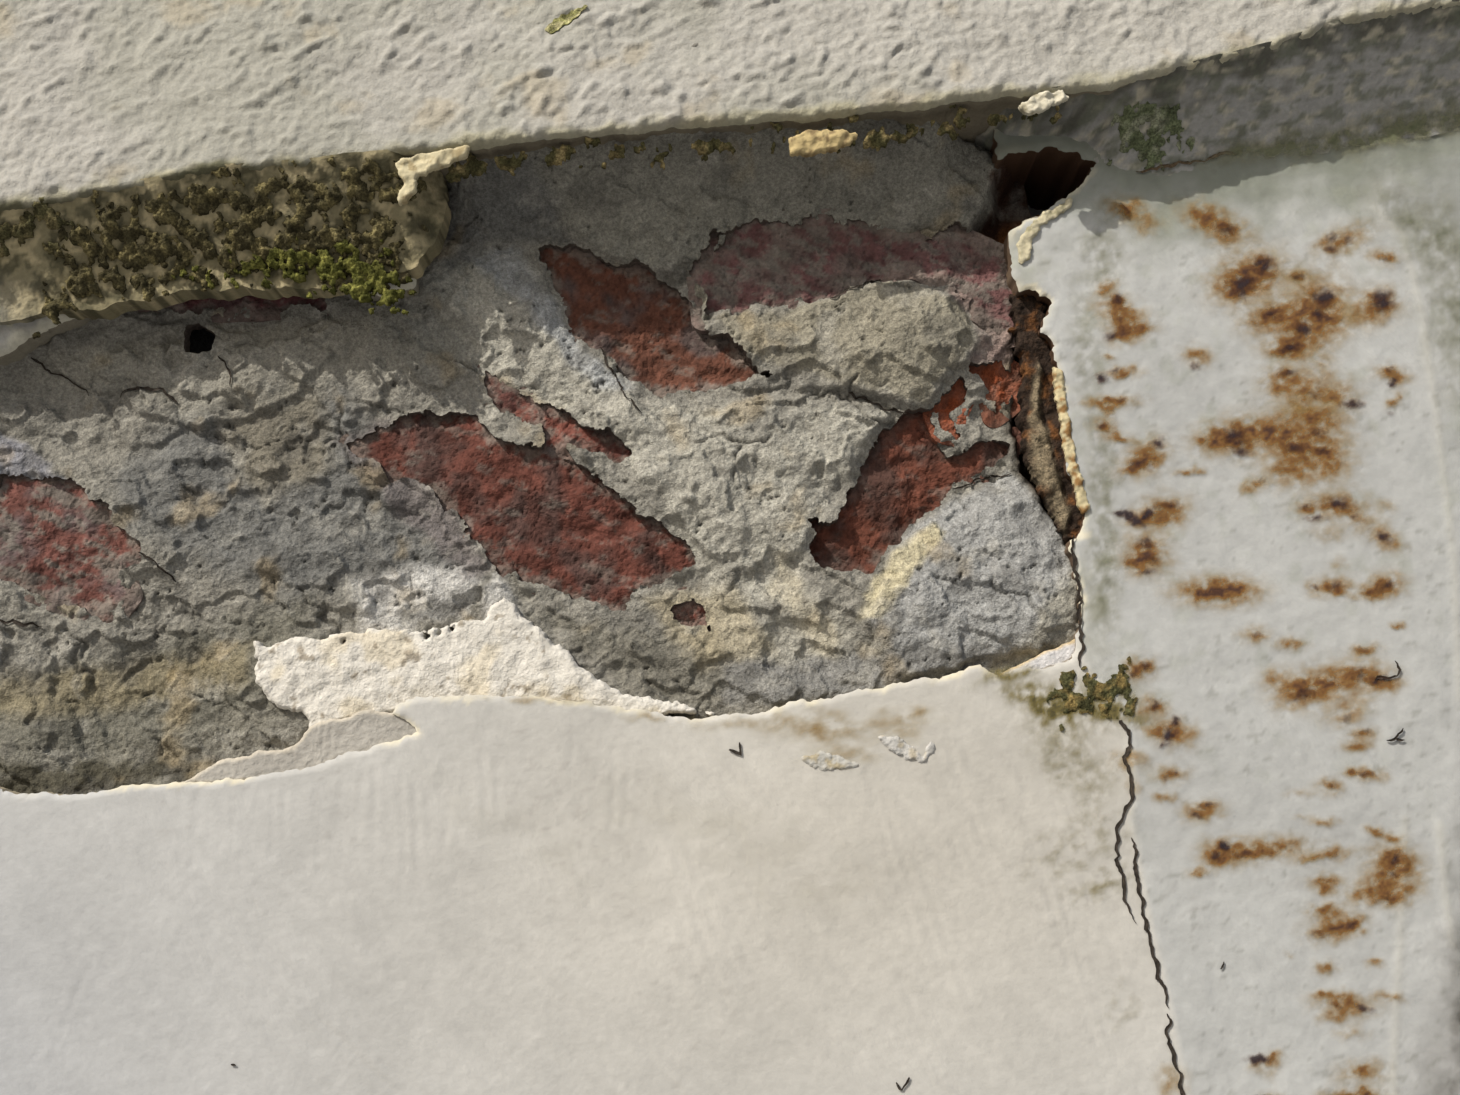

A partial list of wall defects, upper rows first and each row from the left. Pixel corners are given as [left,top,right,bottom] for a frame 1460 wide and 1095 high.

spalling [0,118,1080,795]
spalling [1052,367,1090,514]
rust [1089,282,1165,475]
rust [1195,253,1396,492]
crack [1070,535,1085,667]
rust [1114,500,1183,575]
rust [1180,577,1258,604]
rust [1314,577,1401,600]
rust [1266,647,1400,788]
crack [1114,720,1185,1095]
rust [1191,839,1339,877]
rust [1312,827,1418,940]